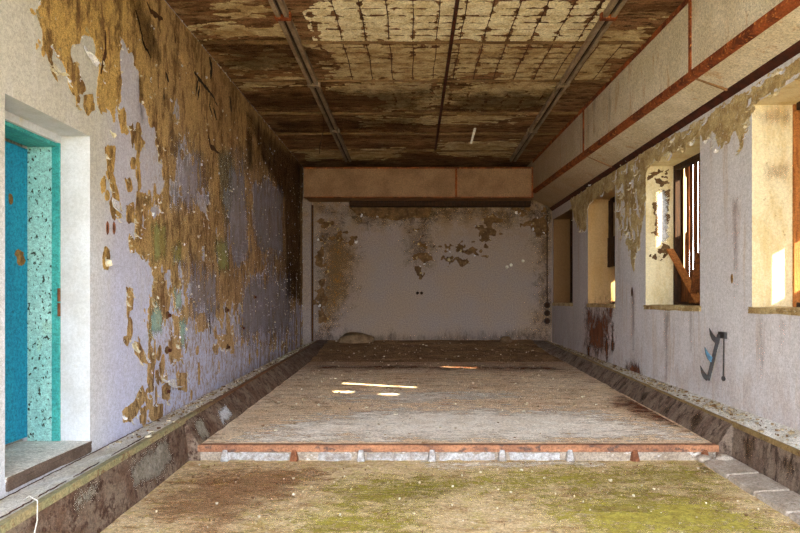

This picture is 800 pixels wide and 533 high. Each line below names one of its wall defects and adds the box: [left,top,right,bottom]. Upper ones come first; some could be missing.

spalling [302,0,610,112]
spalling [573,40,636,80]
damp [452,92,550,111]
peeling [569,57,800,272]
peeling [30,0,303,426]
peeling [313,218,358,324]
peeling [349,205,503,280]
peeling [511,207,549,242]
rust [584,296,614,361]